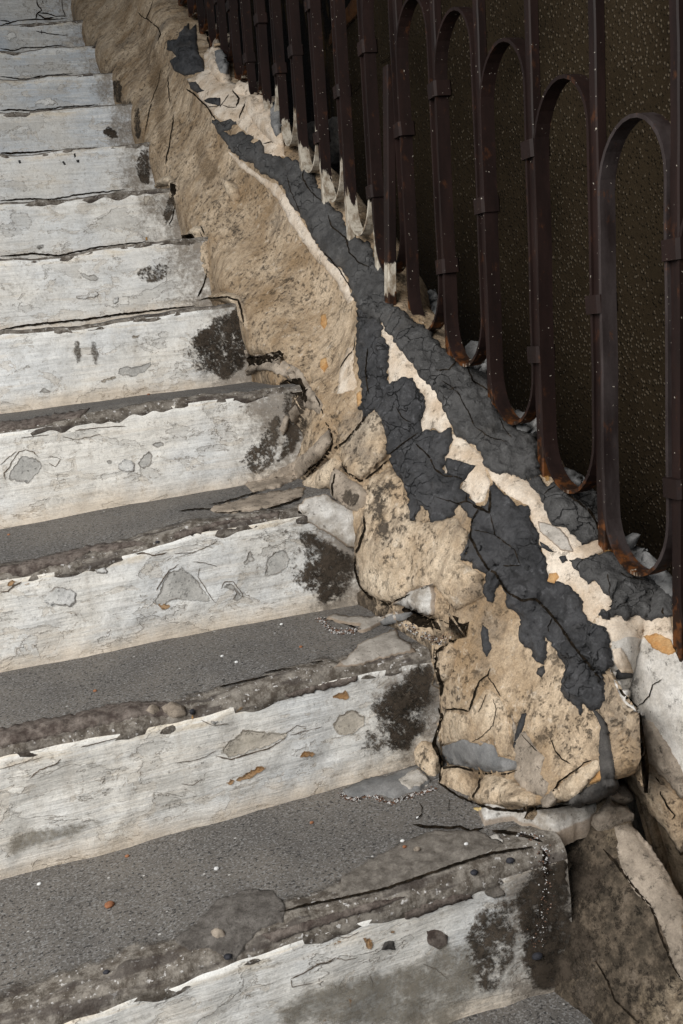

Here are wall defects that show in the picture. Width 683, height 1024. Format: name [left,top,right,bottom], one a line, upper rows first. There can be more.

peeling [229,152,353,305]
mould [185,307,246,379]
mould [239,393,308,473]
peeling [320,346,362,406]
peeling [174,487,305,539]
mould [258,530,356,605]
peeling [381,323,683,771]
peeling [284,583,436,735]
mould [361,664,434,757]
crack [280,516,591,918]
spalling [175,830,505,961]
water stain [280,857,604,1024]